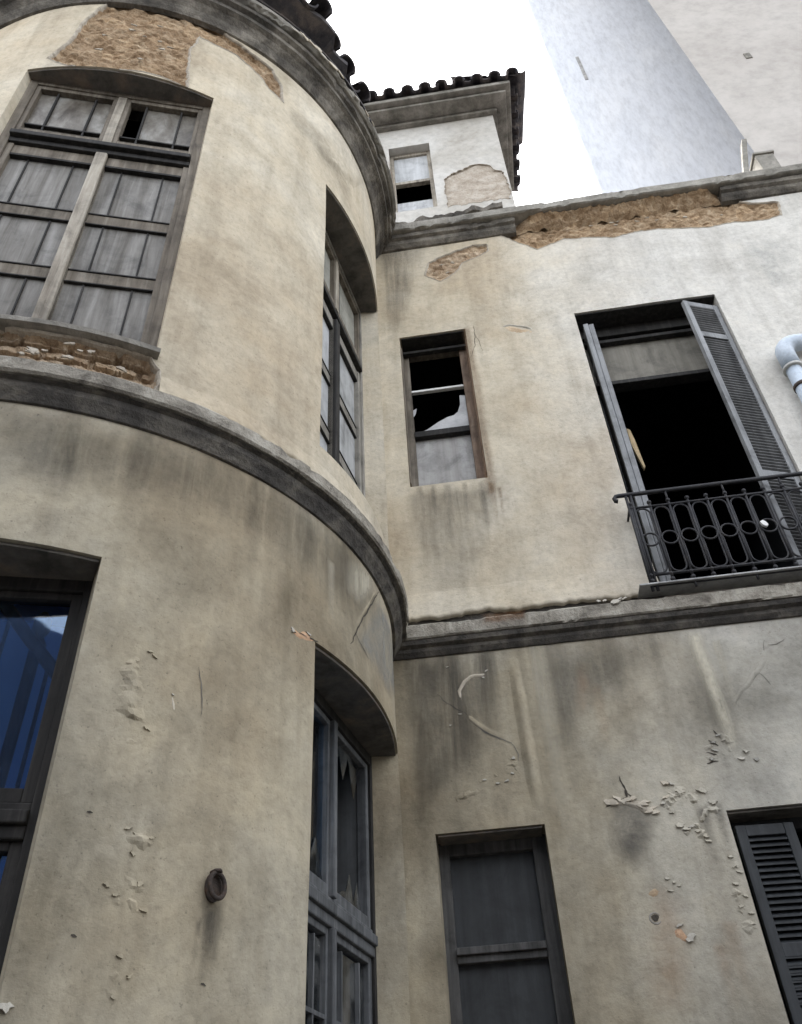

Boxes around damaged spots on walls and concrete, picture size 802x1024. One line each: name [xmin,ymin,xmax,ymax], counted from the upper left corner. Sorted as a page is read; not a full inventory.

flaking render [47,4,284,103]
flaking render [444,164,511,207]
flaking render [501,188,782,250]
flaking render [424,244,489,282]
flaking render [0,327,162,390]
crack [351,591,379,657]
flaking render [113,649,157,731]
water stain [426,666,471,746]
water stain [692,635,728,725]
flaking render [704,730,759,765]
flaking render [604,781,722,842]